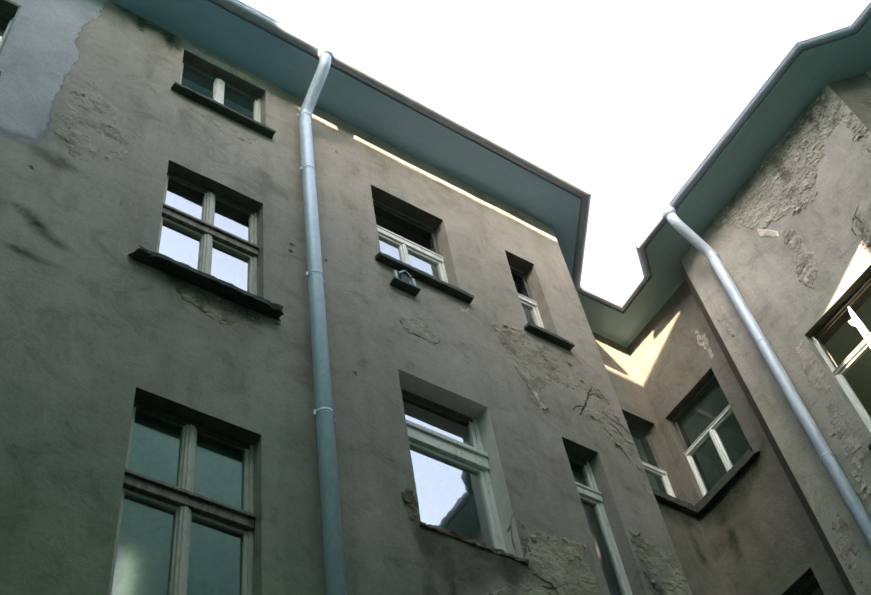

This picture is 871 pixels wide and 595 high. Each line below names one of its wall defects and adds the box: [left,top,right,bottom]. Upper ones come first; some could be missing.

peeling [51,73,129,163]
peeling [712,88,871,290]
peeling [490,321,653,496]
crack [573,386,634,467]
peeling [826,403,871,511]
flaking render [401,487,420,524]
peeling [486,520,599,595]